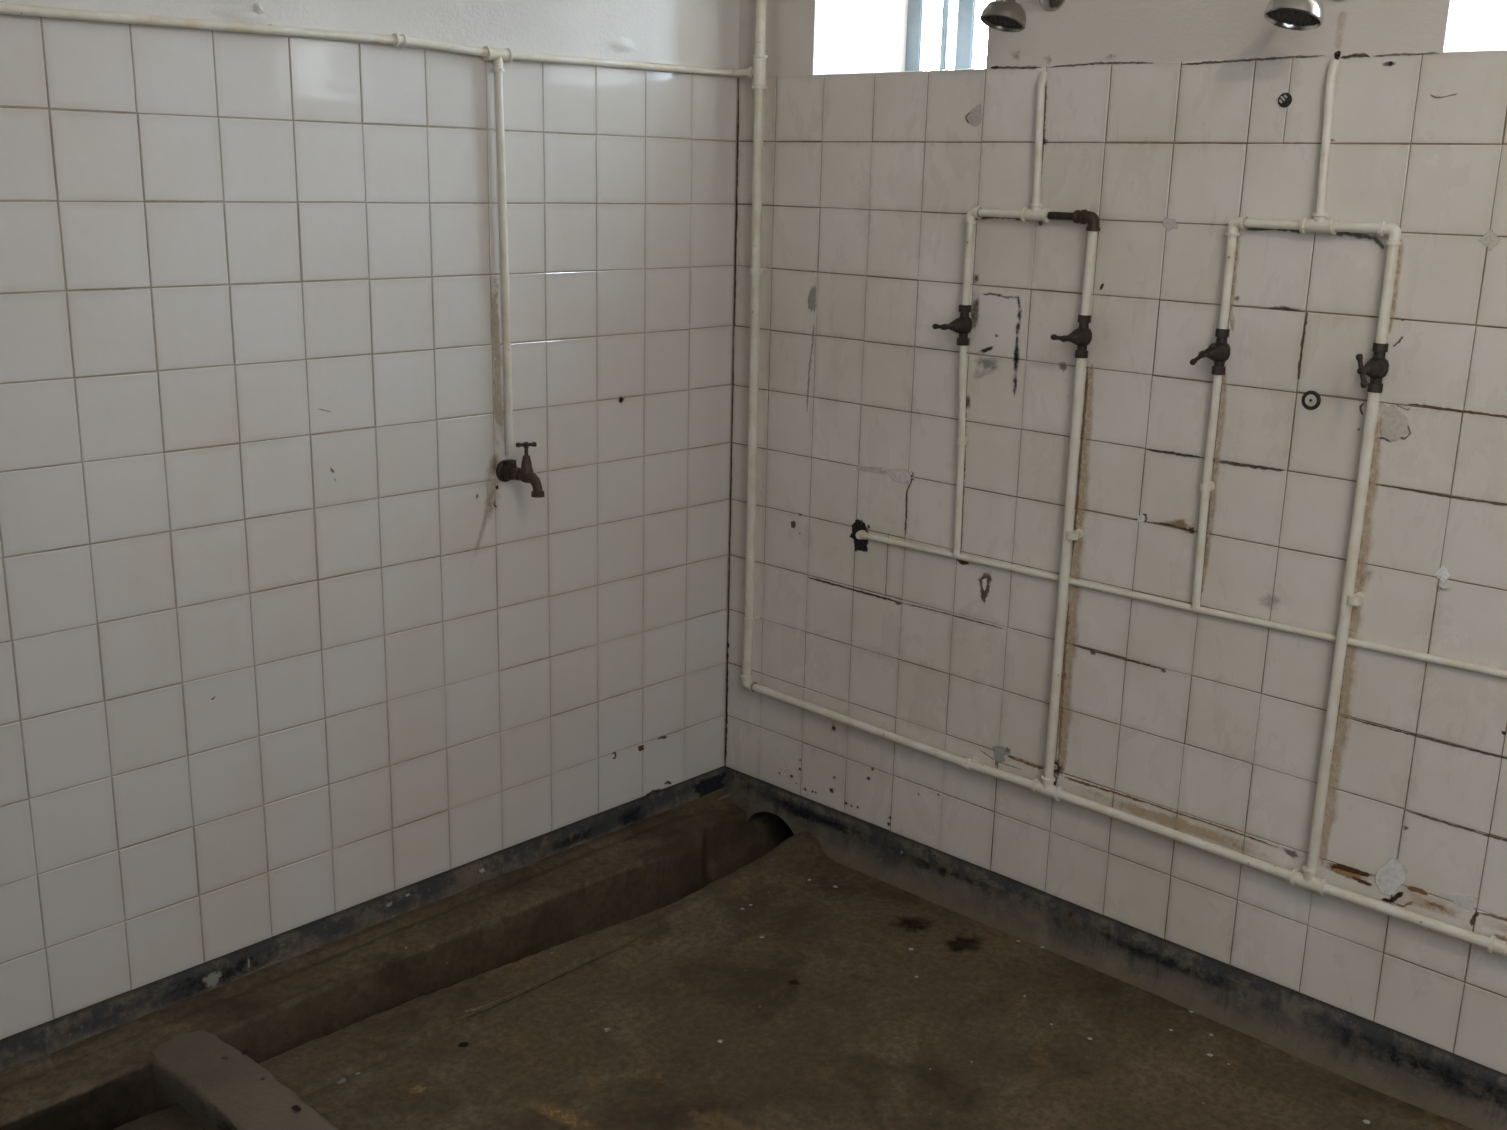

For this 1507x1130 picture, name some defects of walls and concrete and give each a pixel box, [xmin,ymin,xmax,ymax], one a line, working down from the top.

corrosion [1072,370,1088,554]
water stain [1343,716,1507,759]
water stain [1405,810,1507,842]